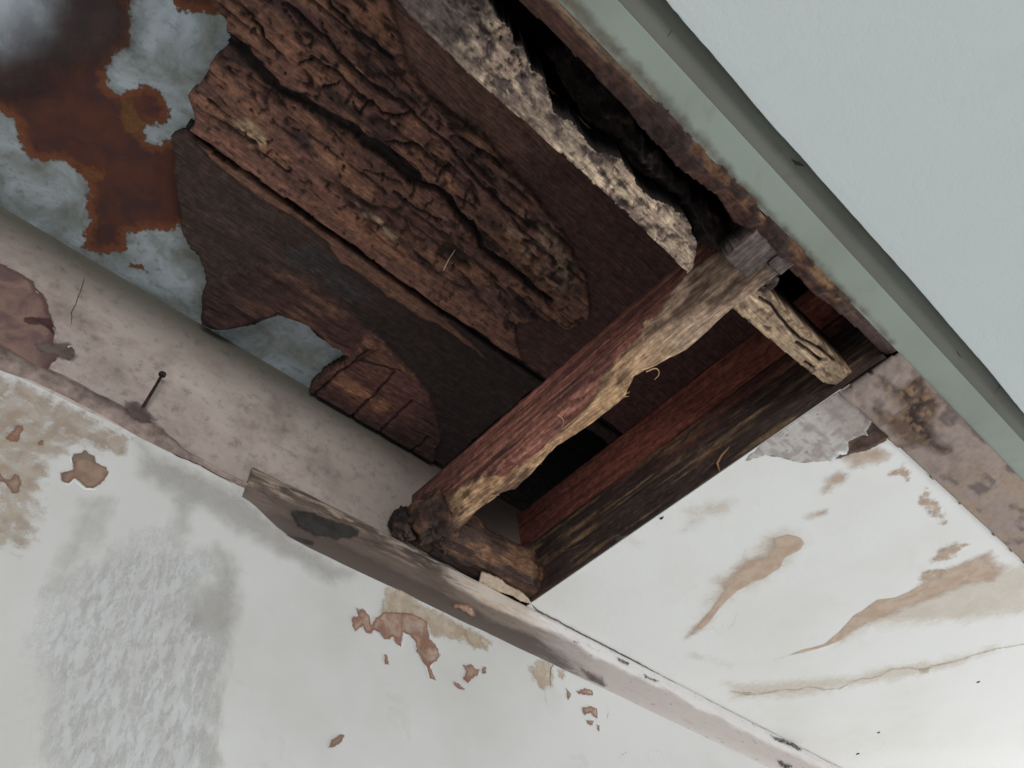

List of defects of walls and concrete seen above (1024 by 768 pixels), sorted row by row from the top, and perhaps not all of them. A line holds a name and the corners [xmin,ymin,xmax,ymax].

rust [0,0,182,255]
spalling [0,263,76,369]
peeling [746,384,872,463]
peeling [60,449,109,490]
leakage [292,510,358,539]
leakage [919,492,947,525]
peeling [478,571,532,604]
leakage [695,535,804,631]
leakage [794,544,1024,654]
peeling [350,609,440,680]
peeling [566,688,600,731]
leakage [737,657,968,695]